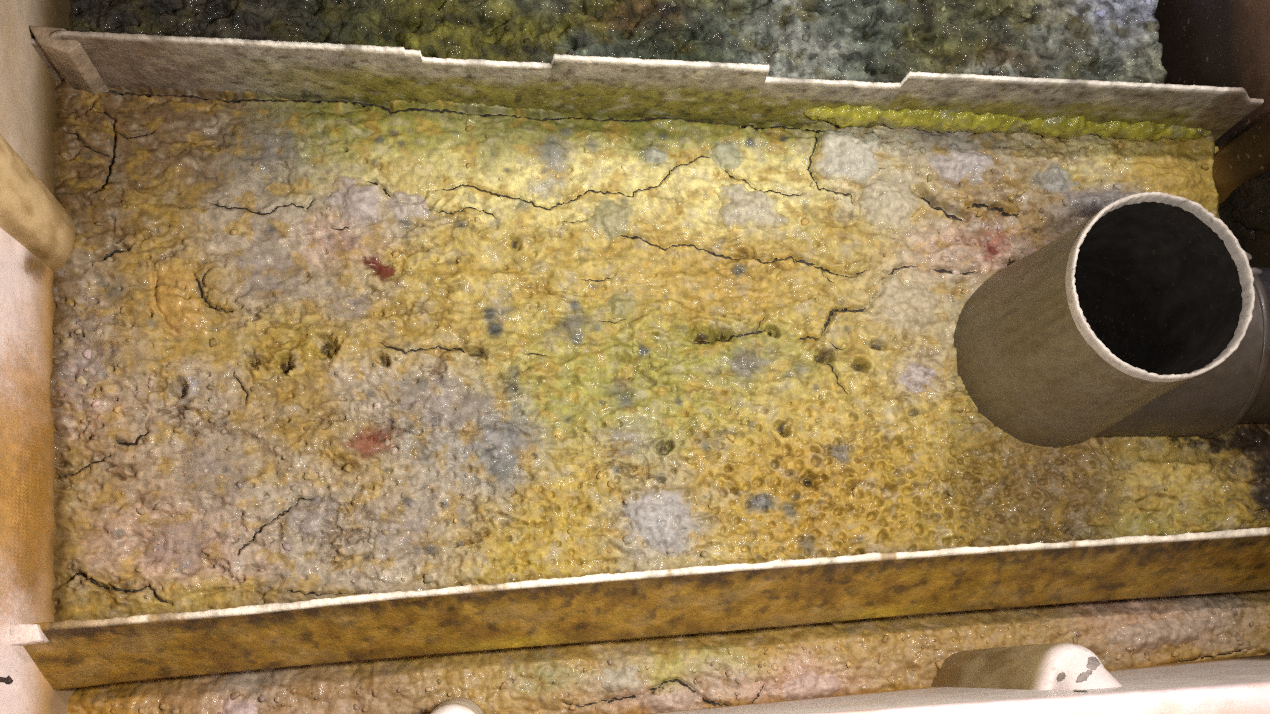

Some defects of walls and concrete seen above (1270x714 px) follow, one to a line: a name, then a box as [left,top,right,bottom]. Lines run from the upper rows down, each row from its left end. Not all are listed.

crack [429,134,853,223]
crack [919,196,1019,221]
crack [621,235,976,394]
crack [380,342,465,354]
crack [239,497,322,553]
crack [67,572,171,604]
crack [287,589,358,597]